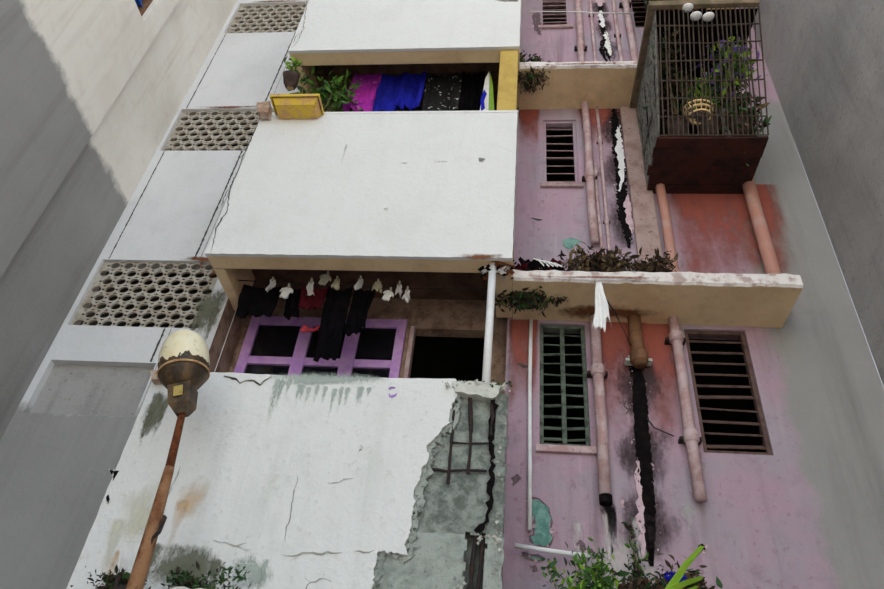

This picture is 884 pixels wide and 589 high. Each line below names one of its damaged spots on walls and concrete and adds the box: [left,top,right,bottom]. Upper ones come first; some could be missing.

crack [211,118,260,250]
water stain [142,393,168,436]
water stain [271,374,378,404]
crack [285,476,374,561]
spalling [373,379,521,589]
peeling [519,497,554,572]